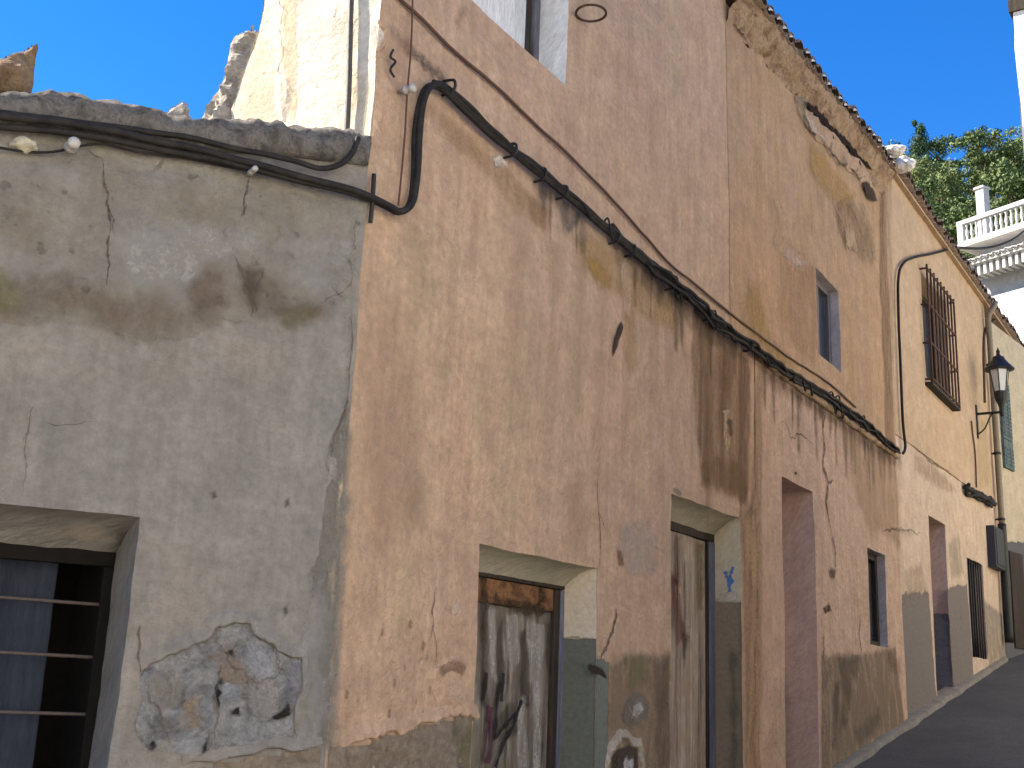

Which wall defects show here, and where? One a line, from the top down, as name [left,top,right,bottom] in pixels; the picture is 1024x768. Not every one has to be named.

crack [89,151,115,286]
crack [241,176,250,216]
spalling [795,95,895,444]
spalling [133,399,480,765]
crack [782,412,836,566]
crack [883,527,919,535]